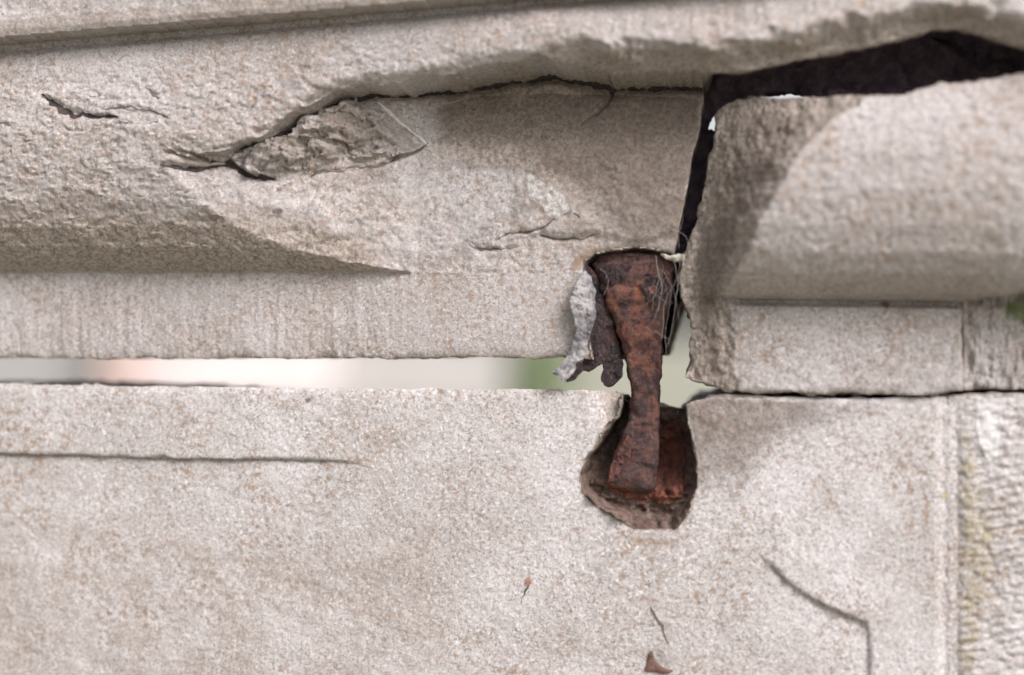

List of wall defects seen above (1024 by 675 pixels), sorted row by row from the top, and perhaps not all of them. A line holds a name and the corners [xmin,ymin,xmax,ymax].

crack [42,87,170,124]
crack [327,73,702,126]
spalling [159,101,531,263]
corrosion [573,247,682,355]
corrosion [581,398,697,529]